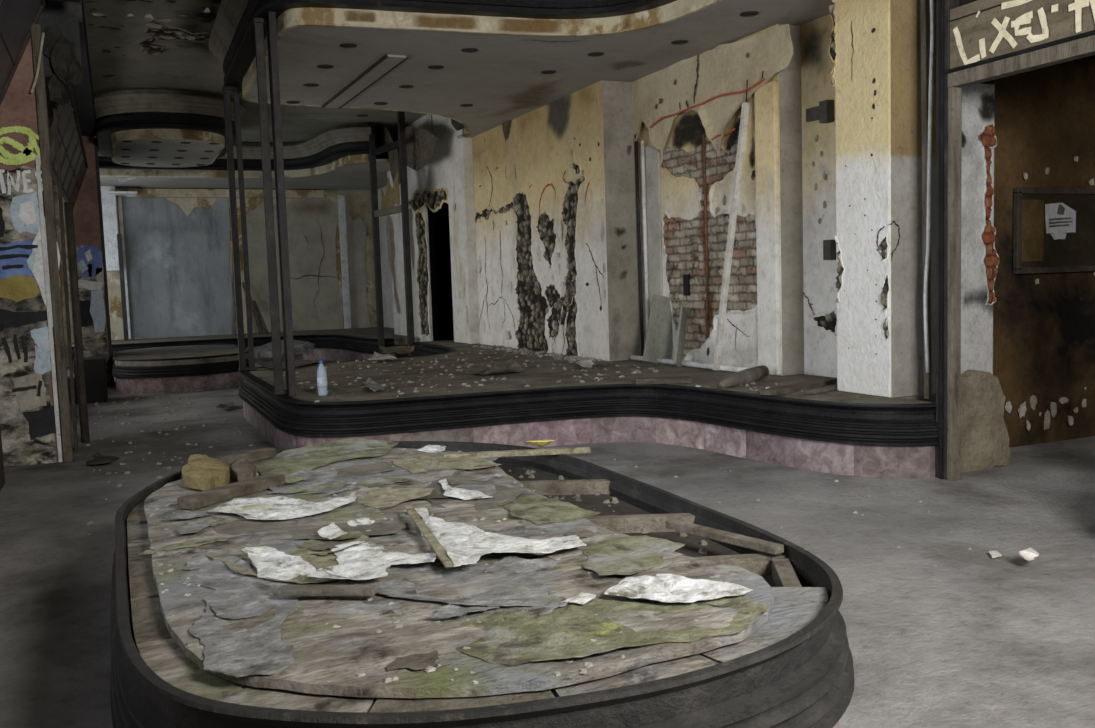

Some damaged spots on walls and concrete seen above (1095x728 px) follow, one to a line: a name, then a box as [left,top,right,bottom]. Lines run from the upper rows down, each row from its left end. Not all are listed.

spalling [829,0,839,87]
spalling [408,186,455,338]
spalling [475,138,591,357]
spalling [660,114,757,361]
spalling [813,236,845,340]
spalling [976,122,999,306]